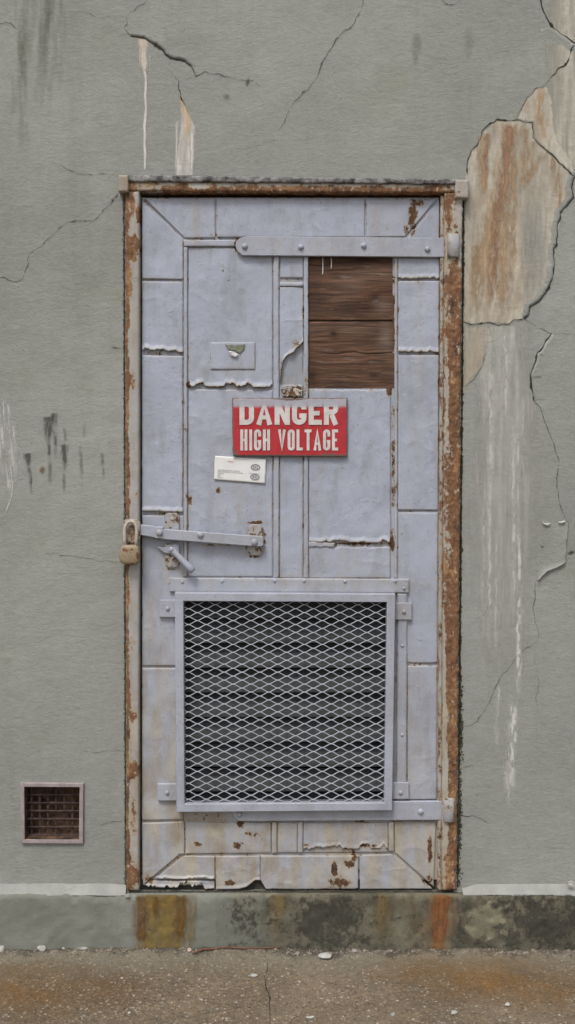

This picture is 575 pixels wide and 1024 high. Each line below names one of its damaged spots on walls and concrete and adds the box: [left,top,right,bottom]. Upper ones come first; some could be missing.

water stain [139,39,148,170]
crack [64,1,259,104]
water stain [175,99,195,175]
crack [281,3,363,127]
crack [1,165,118,282]
crack [465,0,575,522]
water stain [475,325,534,798]
crack [467,593,546,727]
corrosion [137,895,191,949]
water stain [228,895,386,952]
corrosion [425,895,452,949]